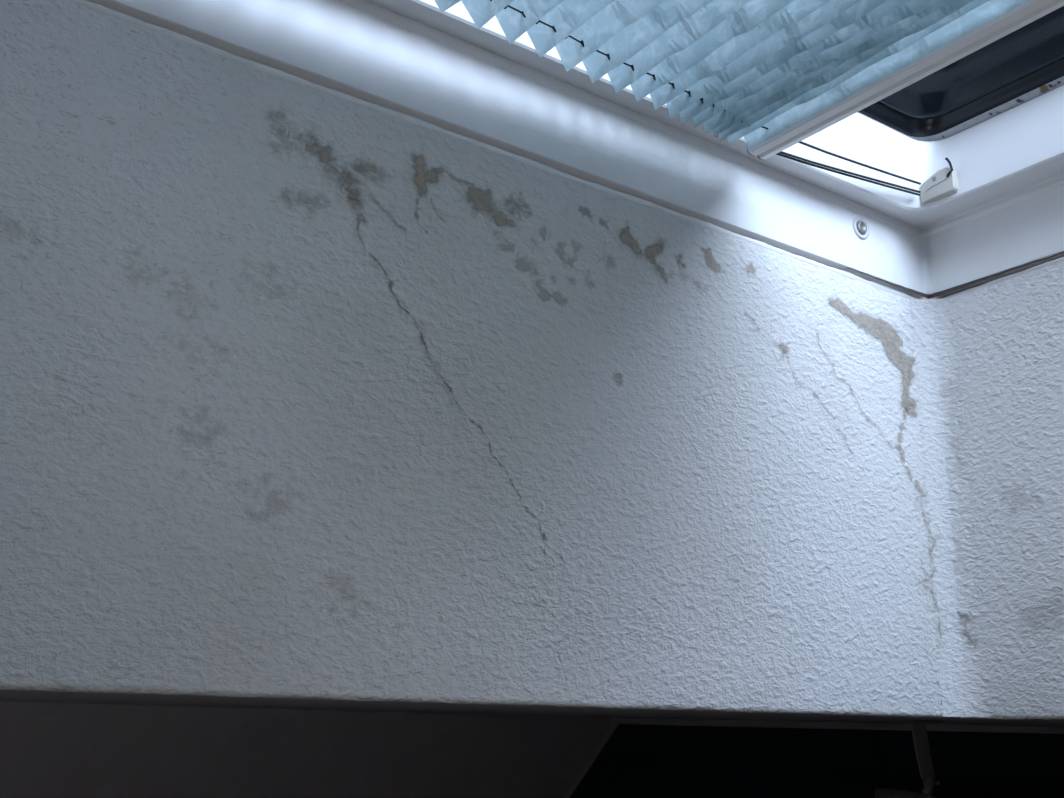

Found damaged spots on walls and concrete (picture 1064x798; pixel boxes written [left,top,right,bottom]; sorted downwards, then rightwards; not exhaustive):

water stain [414,156,514,226]
water stain [621,228,667,281]
water stain [702,248,721,272]
water stain [829,298,923,493]